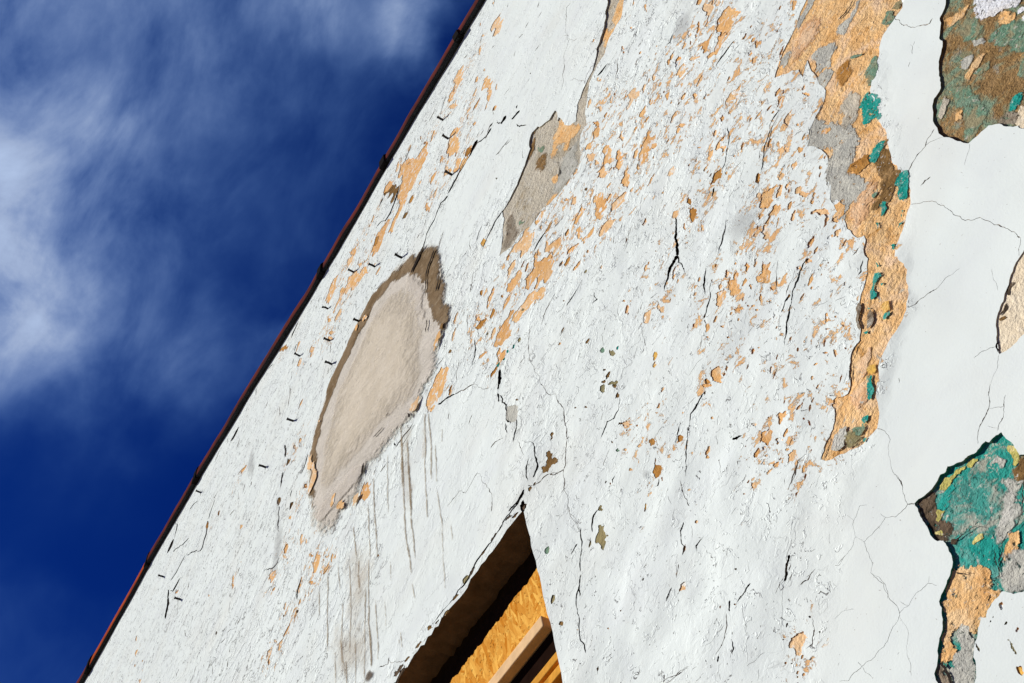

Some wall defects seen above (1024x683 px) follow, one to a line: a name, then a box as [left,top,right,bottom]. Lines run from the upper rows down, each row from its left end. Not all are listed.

flaking render [932,0,1024,143]
crack [256,295,359,412]
peeling [325,65,498,342]
peeling [475,0,707,378]
crack [425,149,932,683]
peeling [692,250,773,338]
peeling [732,0,911,479]
crack [889,130,1021,250]
flaking render [996,252,1024,354]
flaking render [915,432,1024,683]
crack [956,483,1024,580]
crack [941,662,952,683]